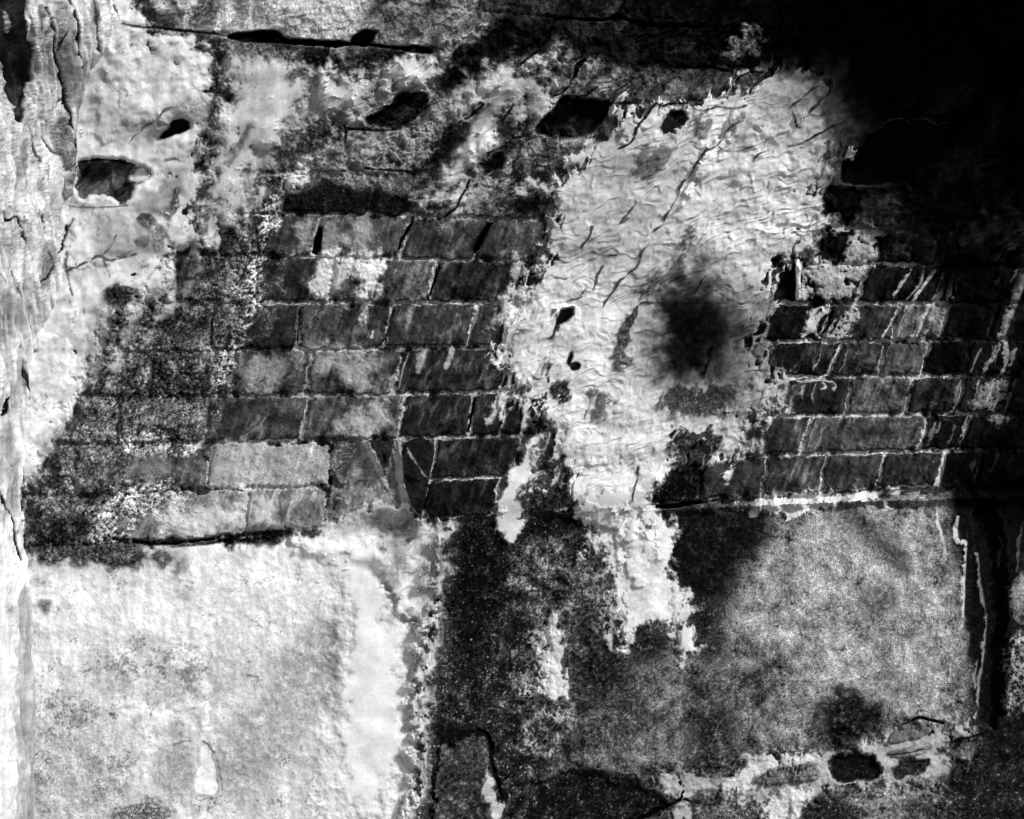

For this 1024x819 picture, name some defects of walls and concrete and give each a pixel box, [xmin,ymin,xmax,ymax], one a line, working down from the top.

flaking render [364,91,428,130]
crack [554,58,586,96]
spalling [535,95,612,140]
crack [568,66,845,306]
peeling [0,0,325,491]
crack [629,301,666,319]
spalling [773,262,796,301]
water stain [881,269,957,342]
crack [703,344,714,378]
spalling [515,361,572,519]
water stain [399,52,916,819]
spalling [307,437,434,553]